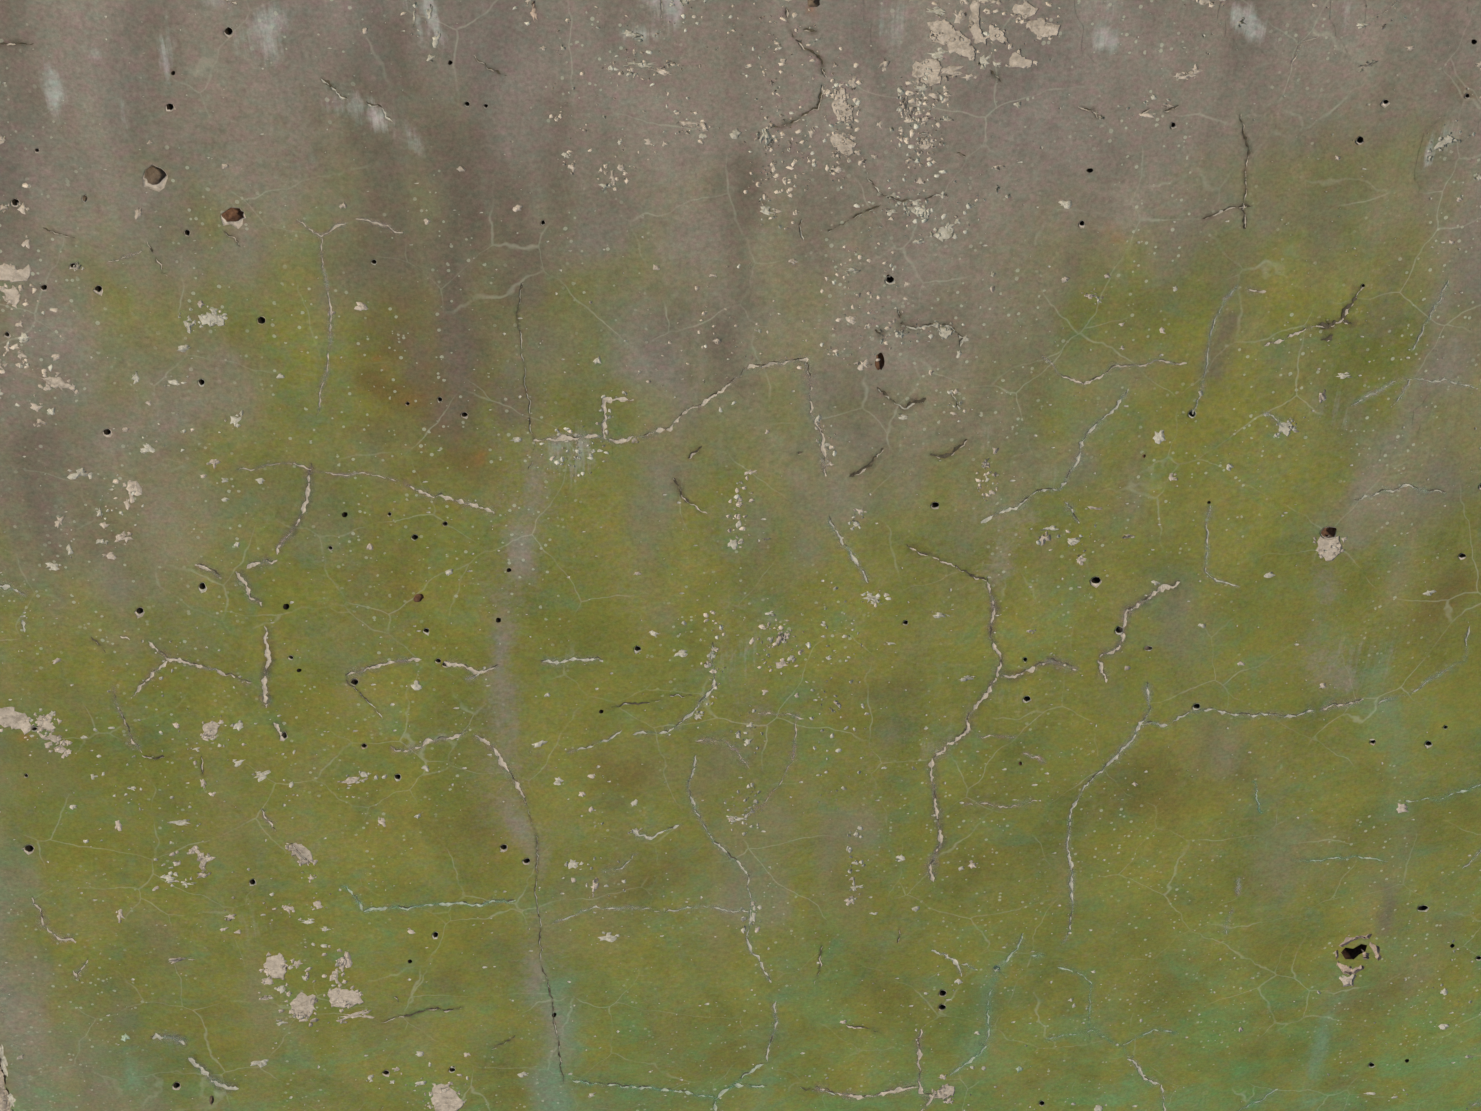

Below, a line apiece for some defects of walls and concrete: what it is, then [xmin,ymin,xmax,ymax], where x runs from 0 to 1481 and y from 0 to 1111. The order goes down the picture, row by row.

peeling [0,235,79,427]
peeling [0,707,115,764]
crack [91,462,494,760]
peeling [232,843,374,1027]
damp [0,0,814,1111]
crack [516,282,884,514]
peeling [549,0,1062,373]
crack [345,506,1442,1111]
damp [917,367,1097,620]
damp [1038,164,1146,312]
damp [719,536,1481,1111]
crack [981,289,1266,523]